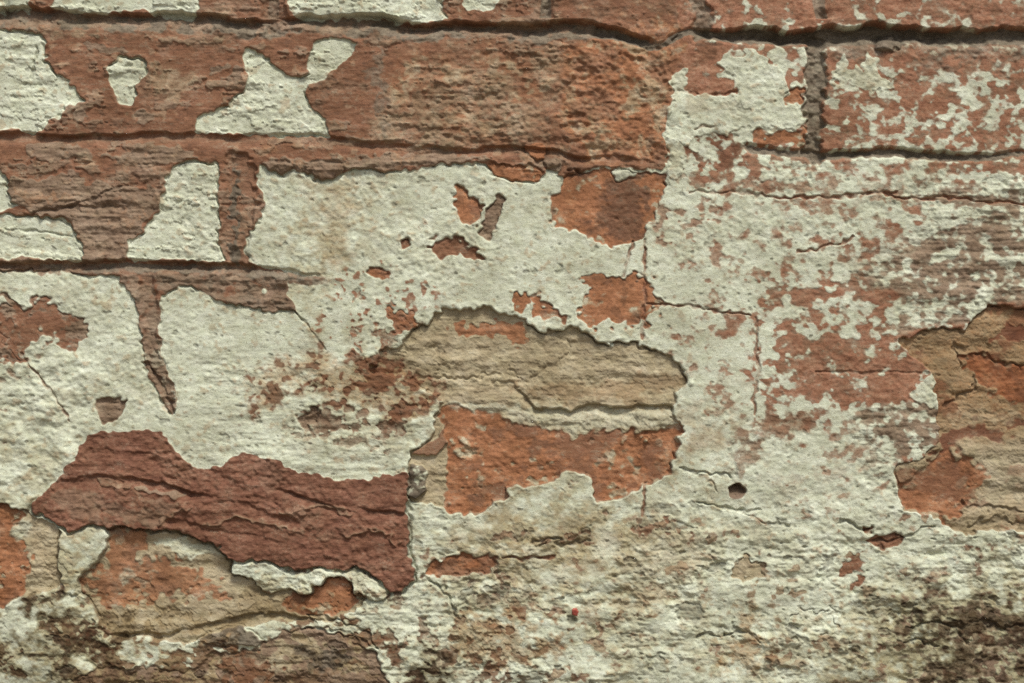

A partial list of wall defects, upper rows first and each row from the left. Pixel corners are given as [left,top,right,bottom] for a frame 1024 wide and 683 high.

peeling [0,30,85,135]
peeling [107,55,147,106]
peeling [196,38,356,139]
spalling [783,86,806,105]
spalling [488,162,544,182]
spalling [549,167,667,248]
spalling [753,126,807,149]
spalling [0,293,89,364]
spalling [369,271,687,515]
spalling [894,305,1024,535]
peeling [97,477,187,501]
crack [678,465,792,533]